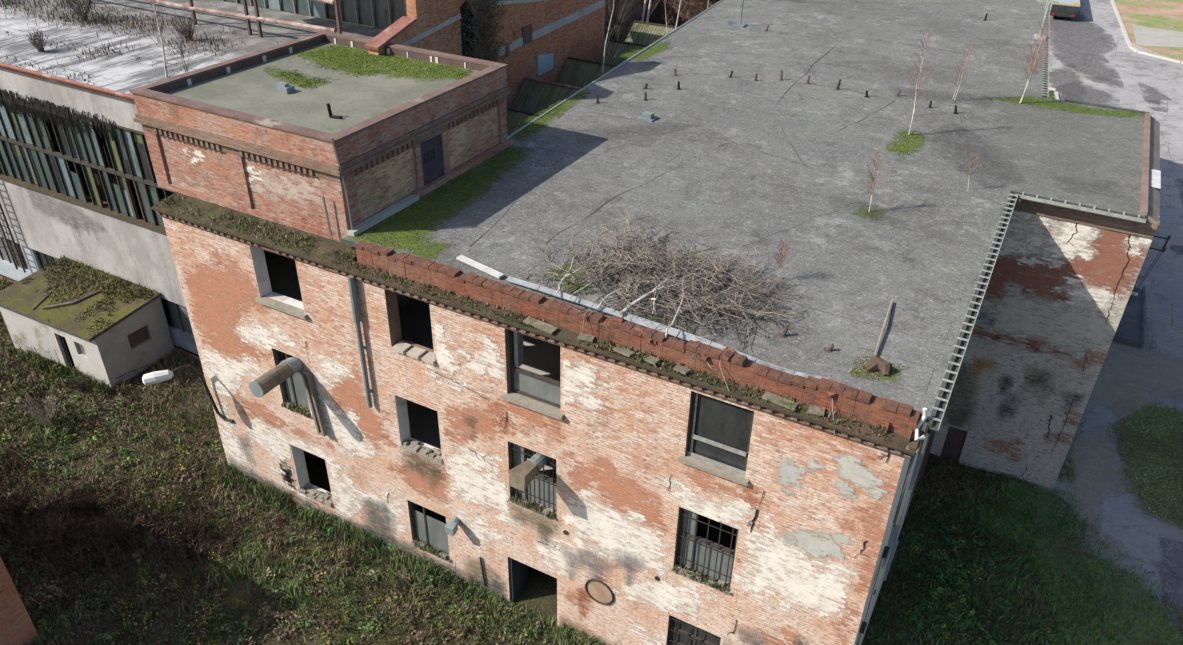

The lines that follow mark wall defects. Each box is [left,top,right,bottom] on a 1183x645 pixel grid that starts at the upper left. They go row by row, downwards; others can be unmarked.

peeling [168,148,209,193]
peeling [245,166,321,204]
spalling [972,211,1152,368]
crack [1106,234,1130,323]
spalling [184,251,407,539]
peeling [423,323,505,391]
peeling [563,357,611,414]
crack [1043,399,1074,452]
peeling [387,400,896,645]